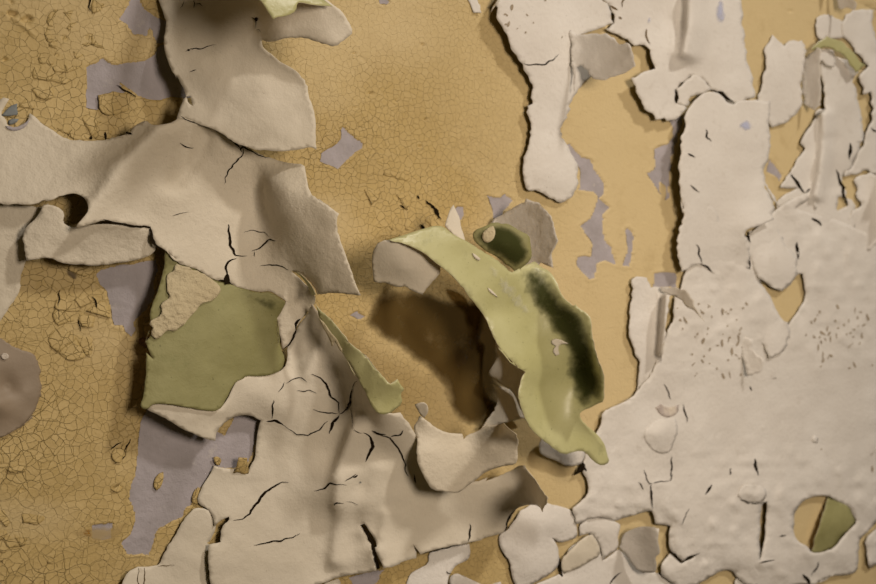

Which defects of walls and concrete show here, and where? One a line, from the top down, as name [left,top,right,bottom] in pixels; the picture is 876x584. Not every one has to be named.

peeling [468,0,482,13]
peeling [0,339,42,437]
peeling [0,0,362,411]
peeling [121,192,609,584]
peeling [491,0,876,584]